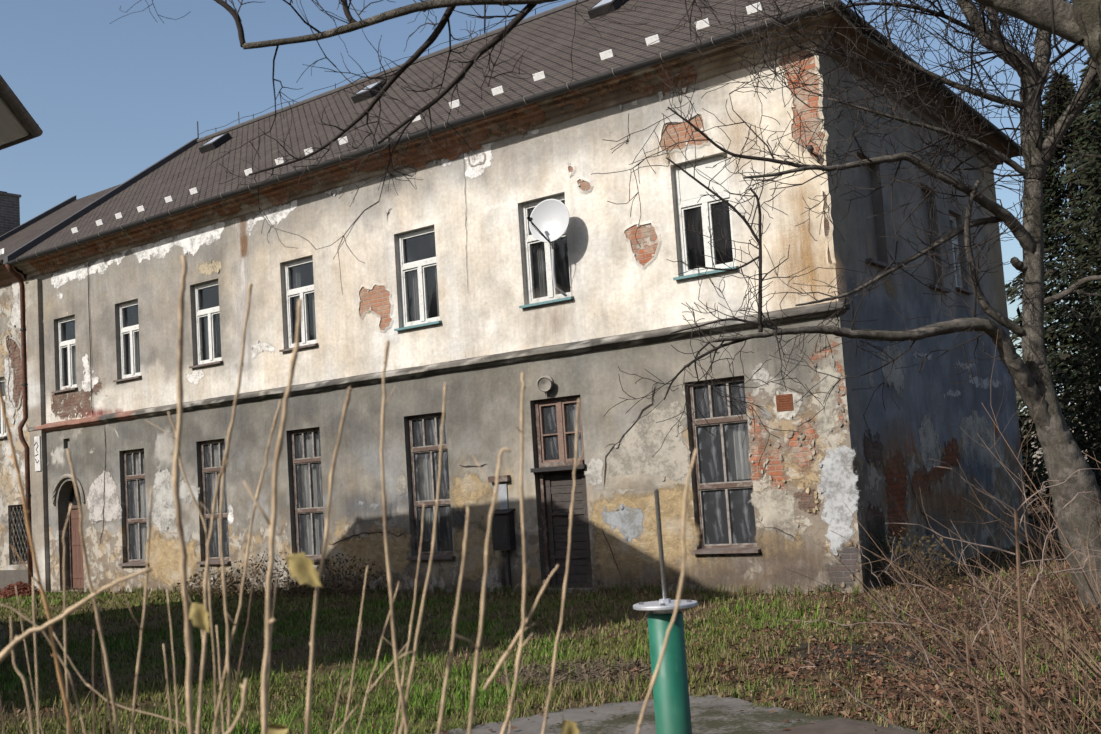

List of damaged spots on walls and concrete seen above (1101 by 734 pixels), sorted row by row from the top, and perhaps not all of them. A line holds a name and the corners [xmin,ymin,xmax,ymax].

spalling [776,48,829,163]
spalling [658,111,713,155]
peeling [441,142,494,179]
peeling [246,200,299,236]
peeling [51,222,225,299]
spalling [622,220,662,270]
spalling [358,282,394,333]
peeling [4,281,22,424]
peeling [747,341,908,591]
peeling [86,471,122,524]
spalling [584,401,735,591]
crack [328,531,406,545]